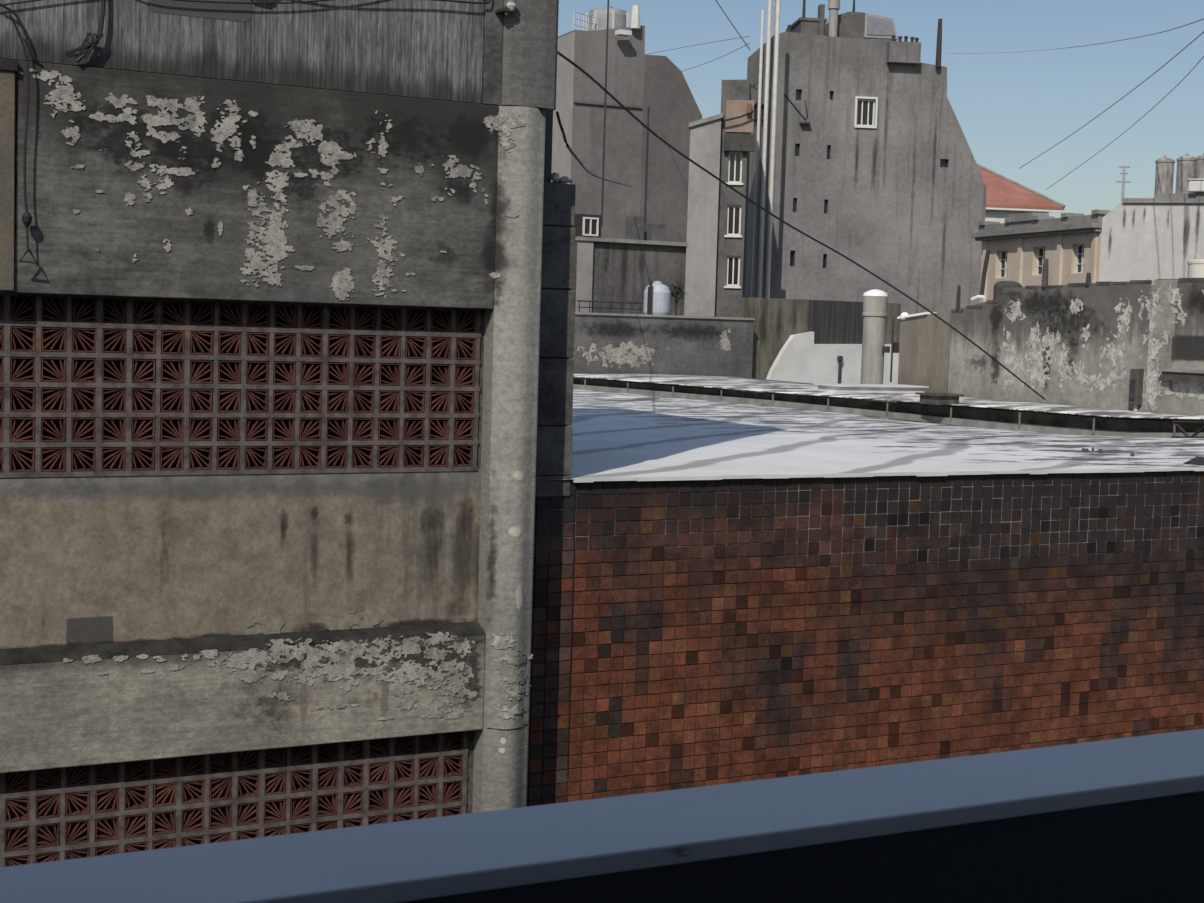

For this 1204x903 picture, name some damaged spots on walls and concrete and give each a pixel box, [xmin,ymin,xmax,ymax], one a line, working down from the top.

peeling [18,69,258,207]
peeling [240,110,415,300]
peeling [414,155,488,205]
leakage [483,185,506,288]
peeling [575,341,669,369]
peeling [719,328,732,351]
peeling [998,274,1204,412]
leakage [1171,336,1204,360]
leakage [454,509,495,594]
peeling [63,610,478,720]
peeling [491,633,533,719]